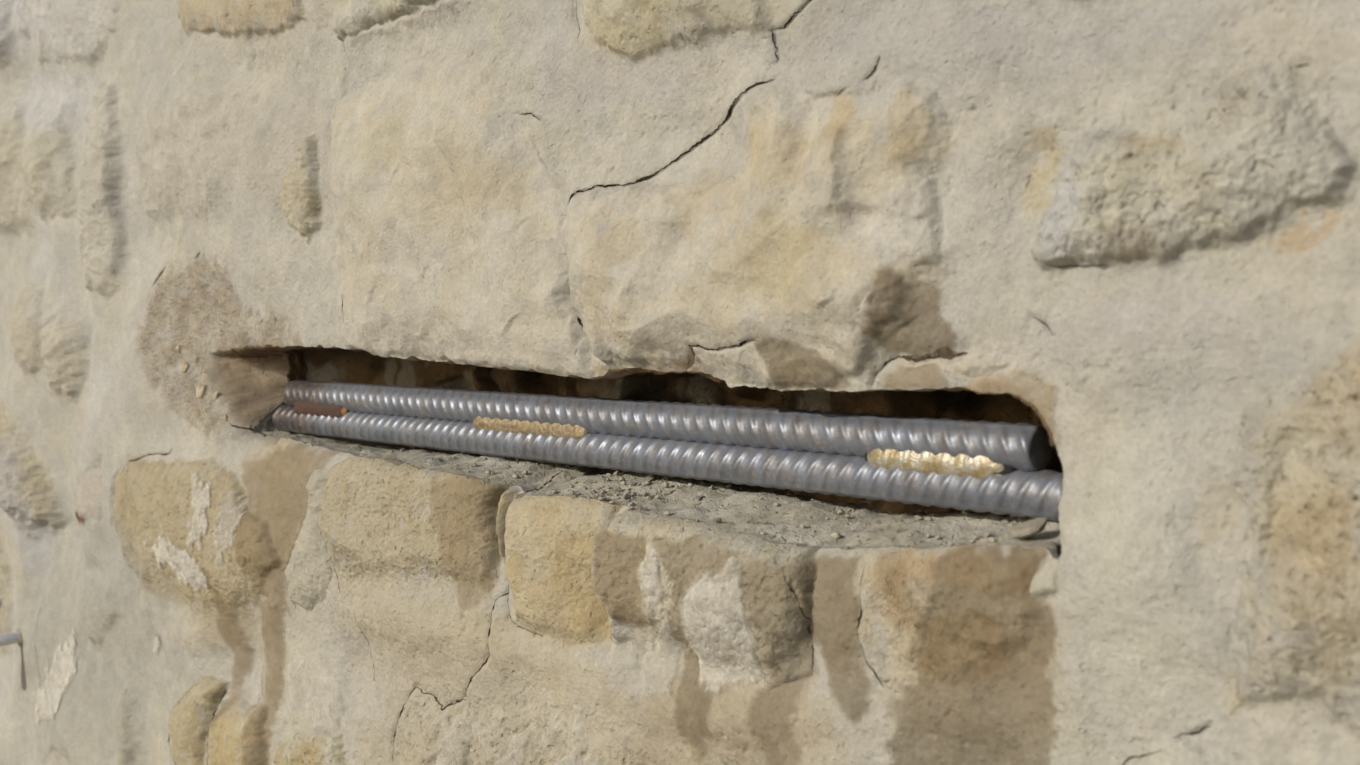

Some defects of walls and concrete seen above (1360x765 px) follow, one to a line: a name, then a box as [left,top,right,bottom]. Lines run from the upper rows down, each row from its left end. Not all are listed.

crack [569,0,810,202]
crack [688,340,753,368]
efflorescence [144,473,244,592]
spalling [1010,517,1049,539]
crack [392,589,536,762]